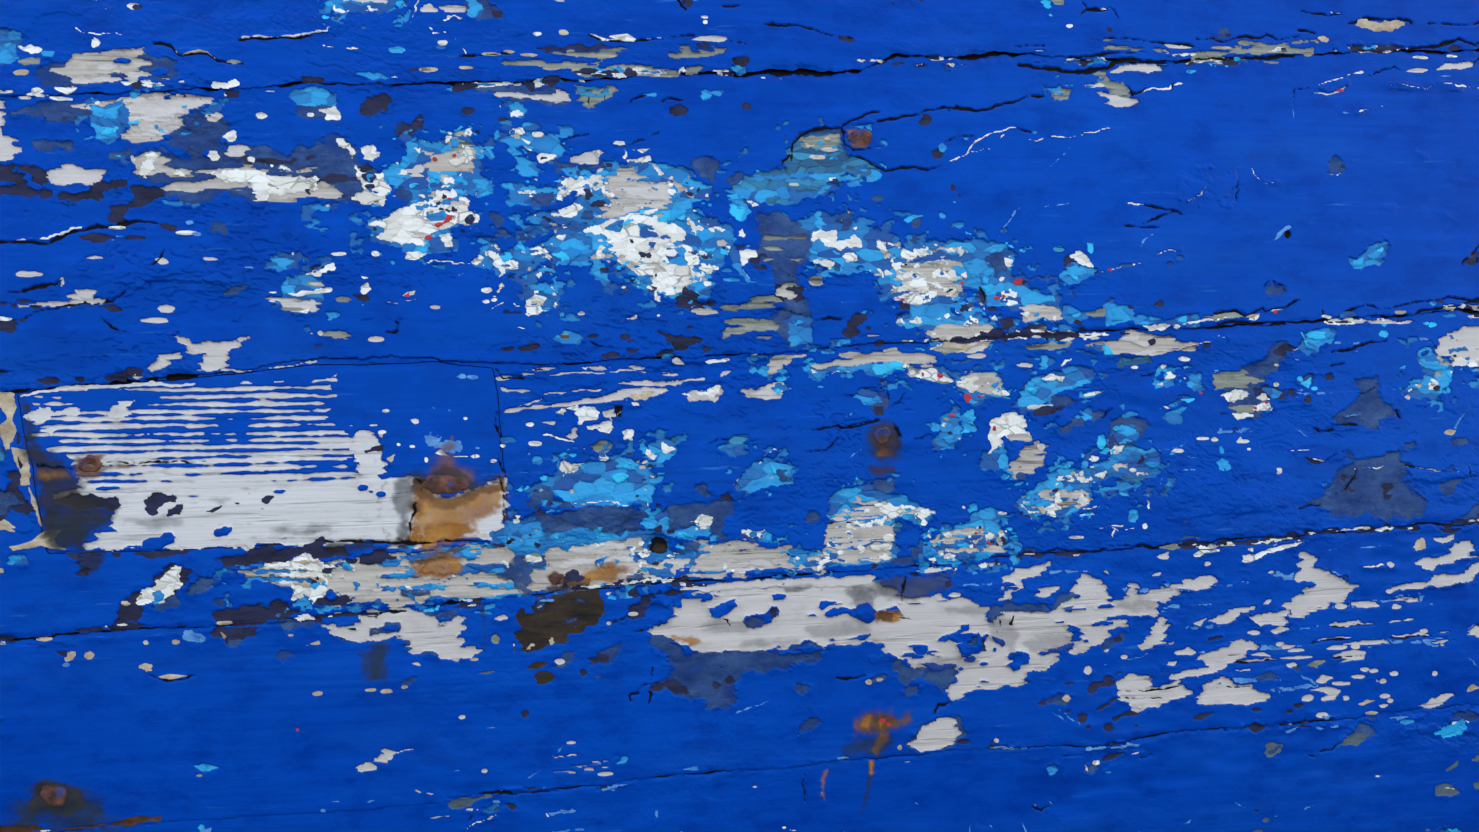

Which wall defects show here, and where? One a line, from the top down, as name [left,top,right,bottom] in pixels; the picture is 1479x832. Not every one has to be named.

crack [153,42,243,64]
peeling [315,0,503,49]
crack [1191,27,1329,117]
crack [1405,38,1479,59]
peeling [0,27,1390,710]
peeling [1393,326,1479,412]
corrosion [406,436,506,578]
corrosion [547,564,626,590]
peeling [1386,535,1479,623]
corrosion [855,714,909,754]
peeling [897,716,969,762]
corrosion [0,781,162,832]